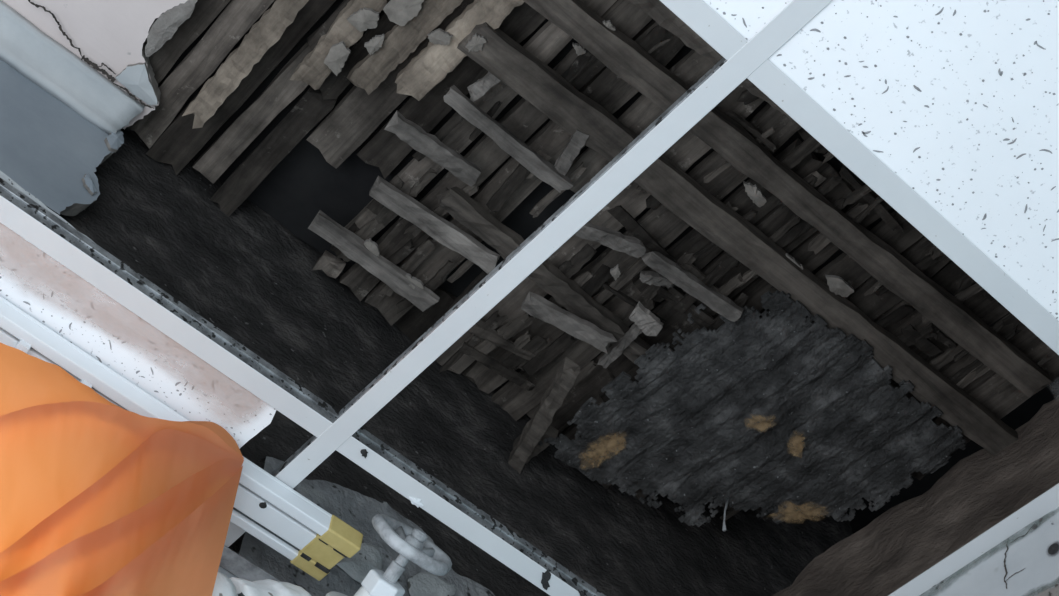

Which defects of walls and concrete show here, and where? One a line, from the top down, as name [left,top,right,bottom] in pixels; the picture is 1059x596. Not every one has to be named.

crack [28,0,154,109]
flaking render [324,41,351,76]
flaking render [347,0,424,55]
flaking render [572,43,586,56]
flaking render [0,0,198,216]
flaking render [743,181,766,207]
flaking render [364,239,380,256]
flaking render [610,264,621,280]
flaking render [825,275,854,297]
flaking render [239,478,495,596]
leakage [919,511,1059,596]
crack [1004,529,1030,589]